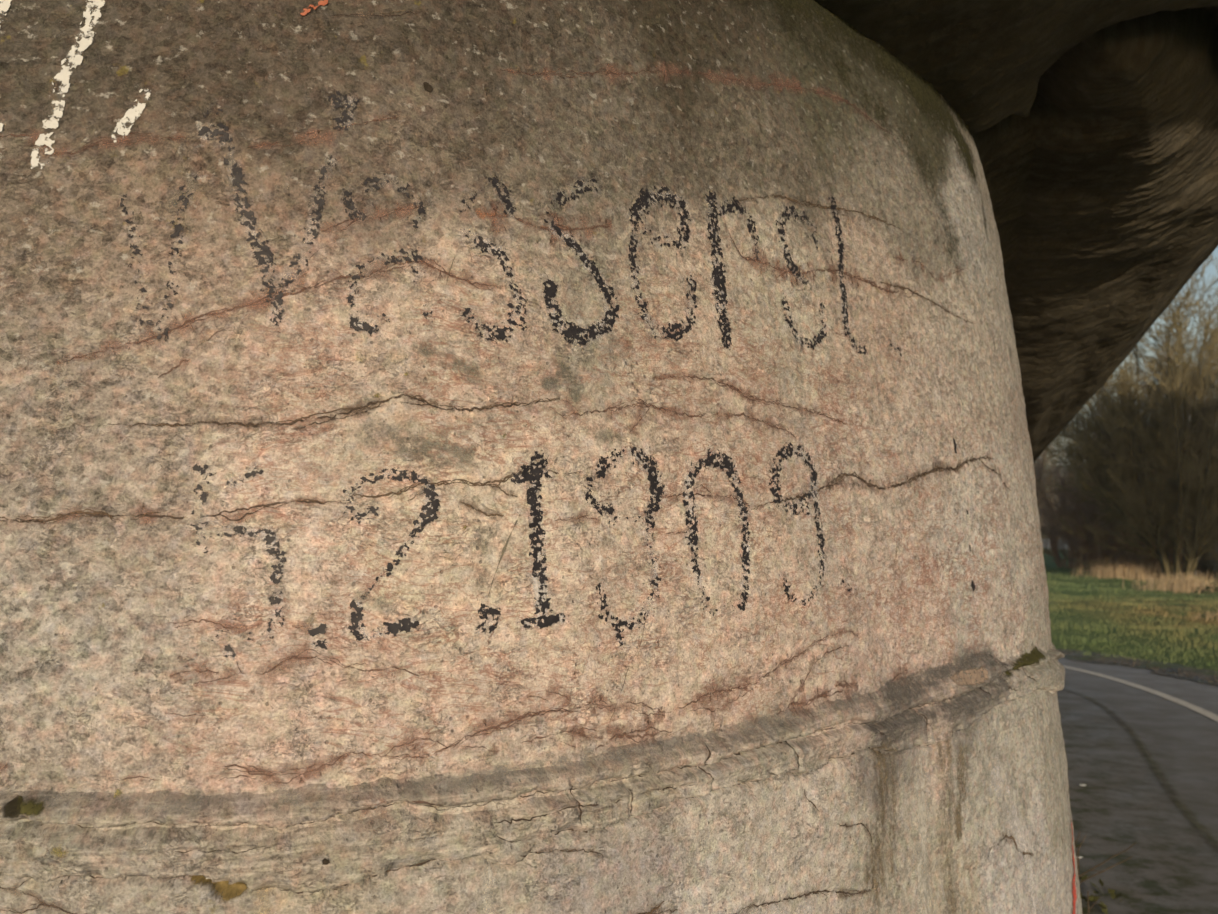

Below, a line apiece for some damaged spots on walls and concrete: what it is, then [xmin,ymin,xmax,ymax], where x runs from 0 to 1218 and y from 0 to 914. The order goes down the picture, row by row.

crack [739,194,971,323]
crack [111,394,560,429]
crack [0,467,582,524]
crack [751,456,1009,510]
crack [304,630,858,777]
crack [175,846,271,854]
crack [494,746,714,856]
crack [785,735,872,841]